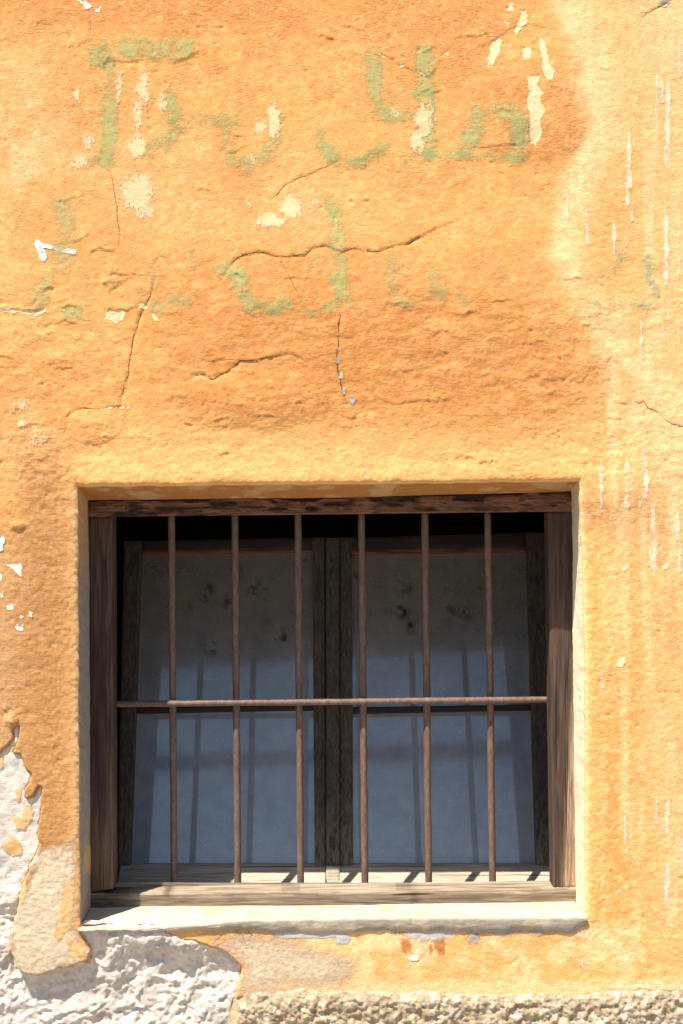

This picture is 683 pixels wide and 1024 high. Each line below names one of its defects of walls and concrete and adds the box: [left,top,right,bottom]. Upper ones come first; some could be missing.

peeling [486,37,502,71]
peeling [504,1,528,35]
peeling [522,37,555,145]
crack [221,237,419,291]
crack [63,288,152,433]
crack [172,316,356,405]
peeling [0,562,32,631]
spalling [0,726,355,1024]